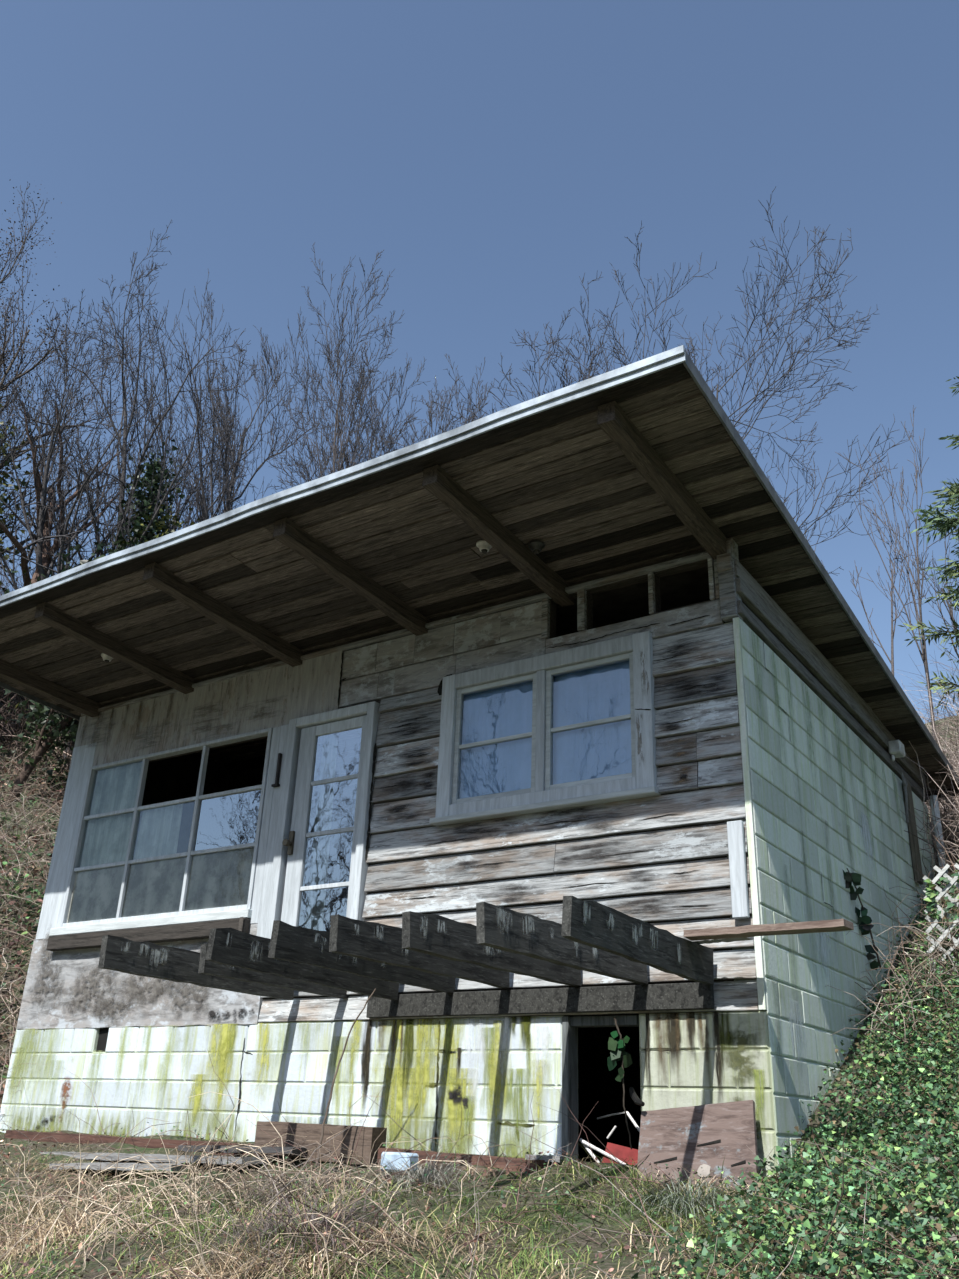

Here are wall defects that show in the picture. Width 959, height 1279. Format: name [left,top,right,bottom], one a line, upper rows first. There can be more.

water stain [664,643,724,698]
water stain [389,714,434,823]
water stain [449,819,517,842]
water stain [554,808,618,862]
water stain [483,883,533,902]
water stain [624,871,662,914]
water stain [10,1035,28,1095]
water stain [189,1074,203,1125]
water stain [208,1009,269,1110]
water stain [333,1018,475,1154]
water stain [489,1016,544,1158]